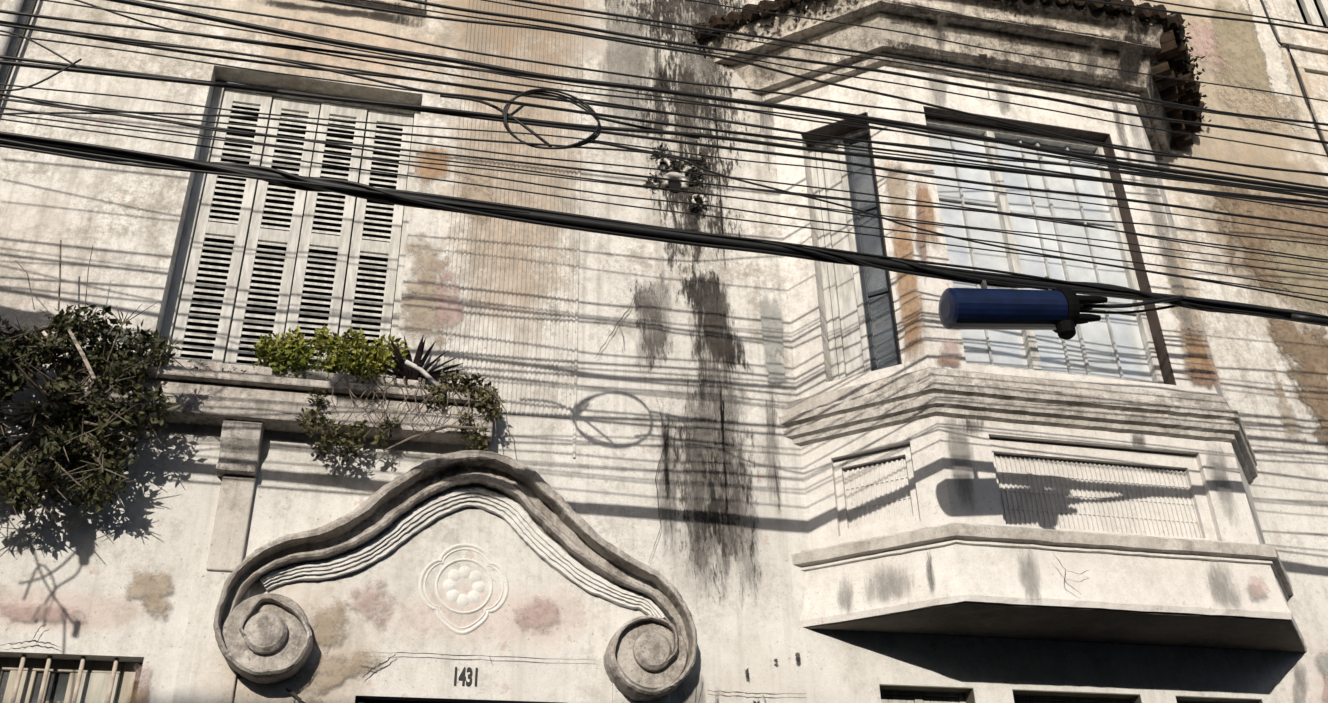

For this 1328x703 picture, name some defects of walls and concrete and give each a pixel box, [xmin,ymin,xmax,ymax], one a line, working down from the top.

damp [605,0,779,599]
flaking render [1212,185,1328,448]